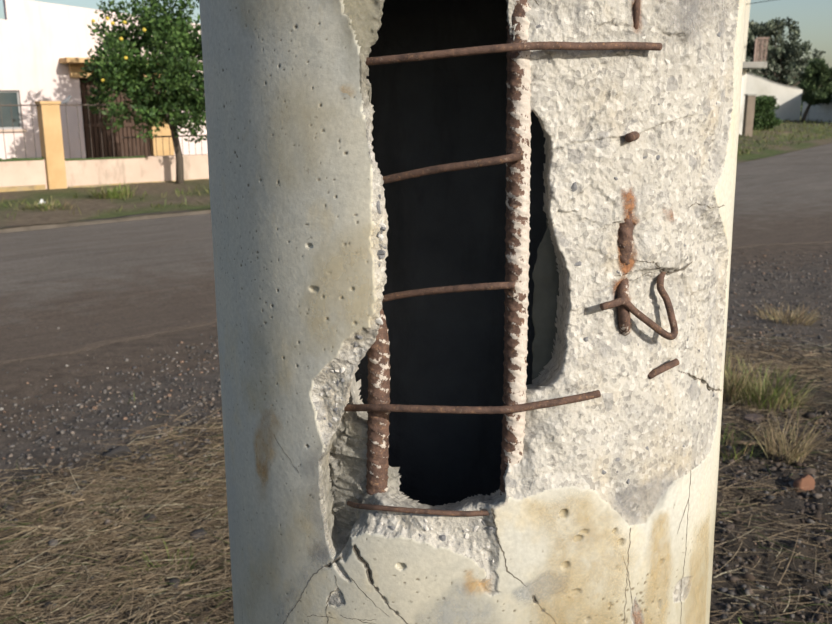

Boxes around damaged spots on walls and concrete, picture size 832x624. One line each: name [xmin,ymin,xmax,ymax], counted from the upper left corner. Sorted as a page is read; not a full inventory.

rust [623,190,637,225]
spalling [311,0,740,596]
rust [614,244,636,299]
spalling [327,588,345,607]
crack [283,545,408,624]
crack [491,508,557,624]
crack [623,528,636,624]
spalling [672,576,693,603]
crack [677,471,691,621]